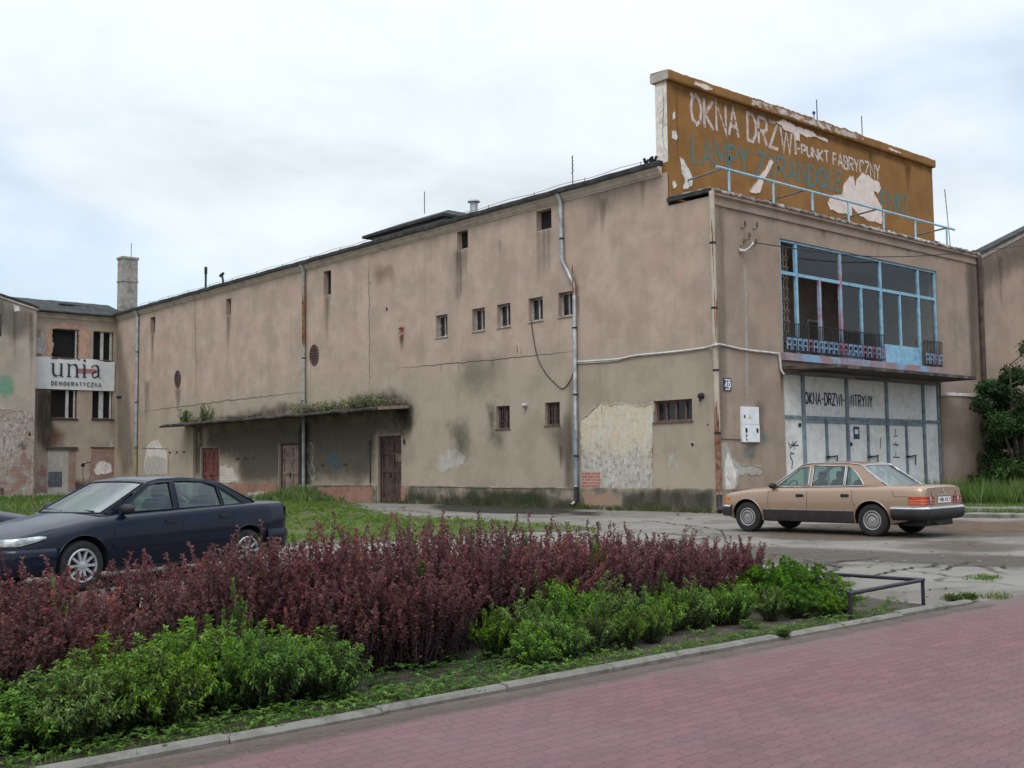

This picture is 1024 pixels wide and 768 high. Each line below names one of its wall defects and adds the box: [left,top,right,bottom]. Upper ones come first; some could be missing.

peeling [750,98,865,143]
peeling [672,156,693,191]
peeling [748,158,774,195]
peeling [826,171,883,226]
flaking render [0,408,35,498]
peeling [80,460,113,476]
peeling [143,439,168,476]
peeling [579,401,655,507]
peeling [721,441,764,490]